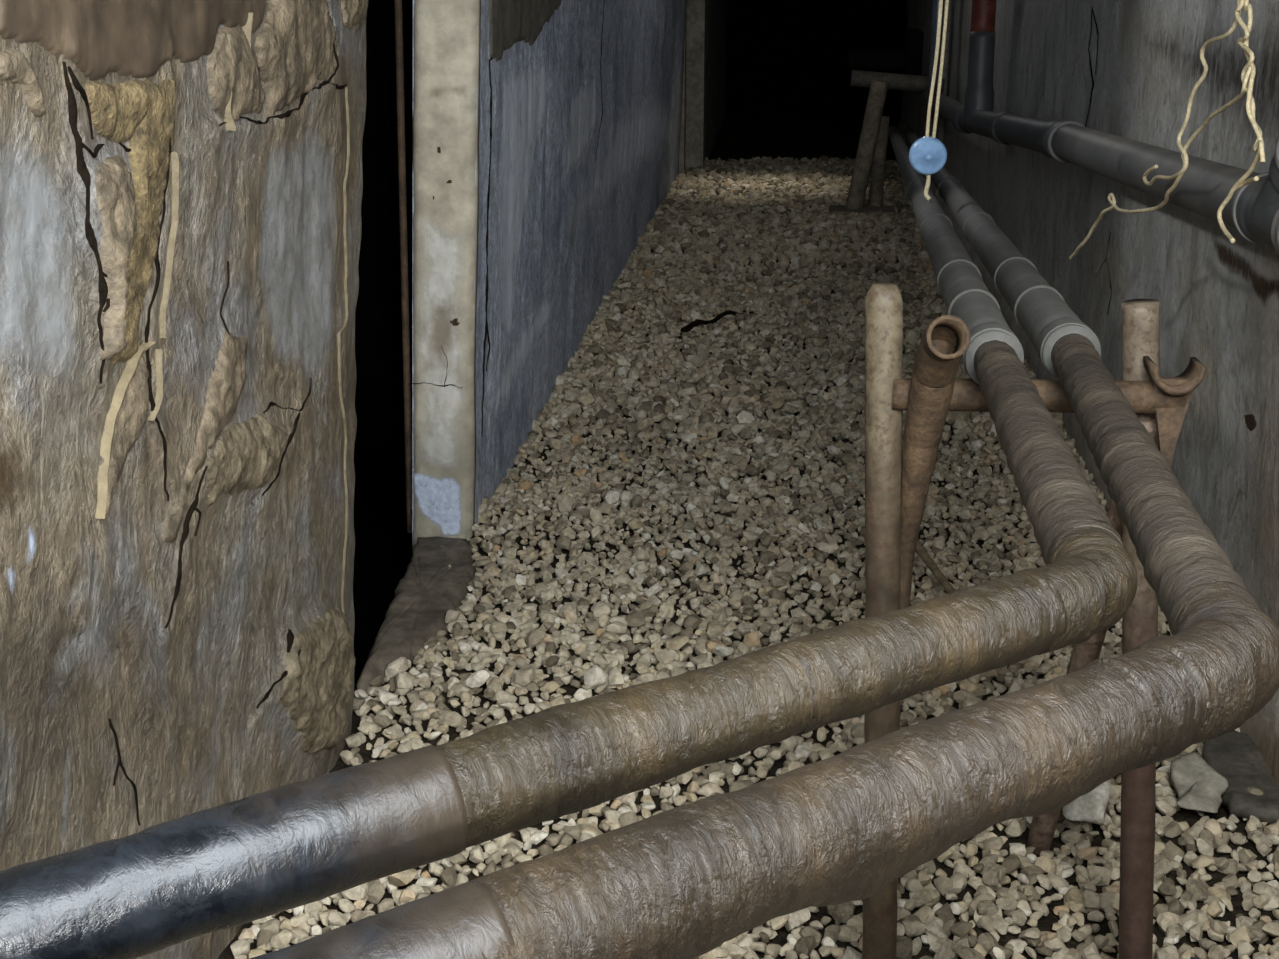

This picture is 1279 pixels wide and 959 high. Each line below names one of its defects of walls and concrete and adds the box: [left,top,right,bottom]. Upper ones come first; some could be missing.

crack [219,42,347,126]
flaking render [489,0,561,62]
crack [62,62,131,384]
flaking render [0,0,368,514]
crack [144,137,208,628]
crack [261,377,312,496]
crack [108,719,141,825]